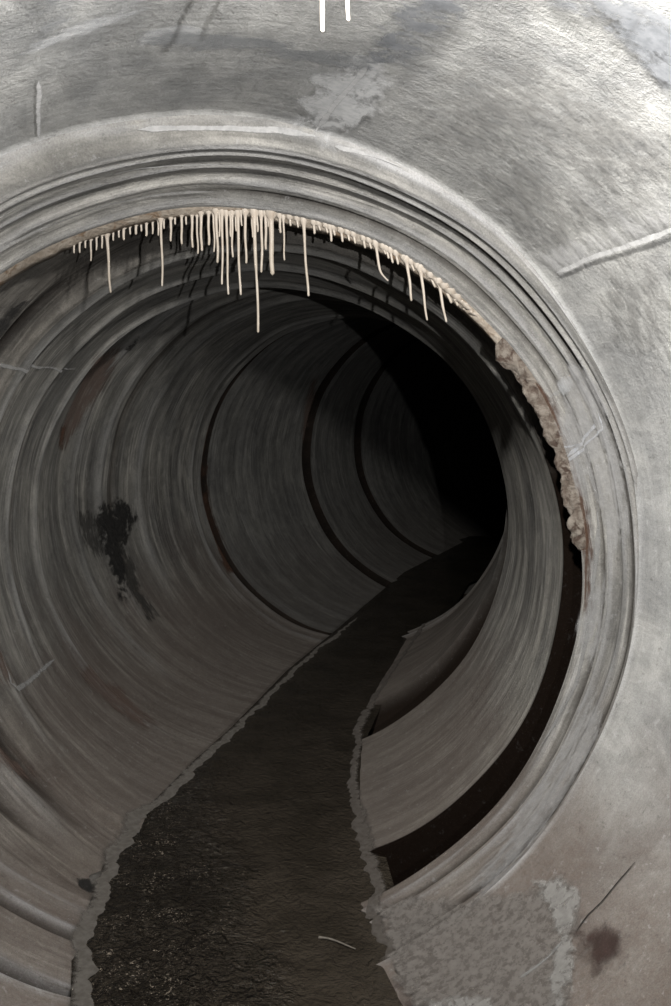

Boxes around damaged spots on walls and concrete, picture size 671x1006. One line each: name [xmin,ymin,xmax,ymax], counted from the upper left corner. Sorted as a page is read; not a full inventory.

water stain [556,0,671,88]
water stain [0,207,501,344]
water stain [79,500,155,621]
water stain [580,926,619,972]